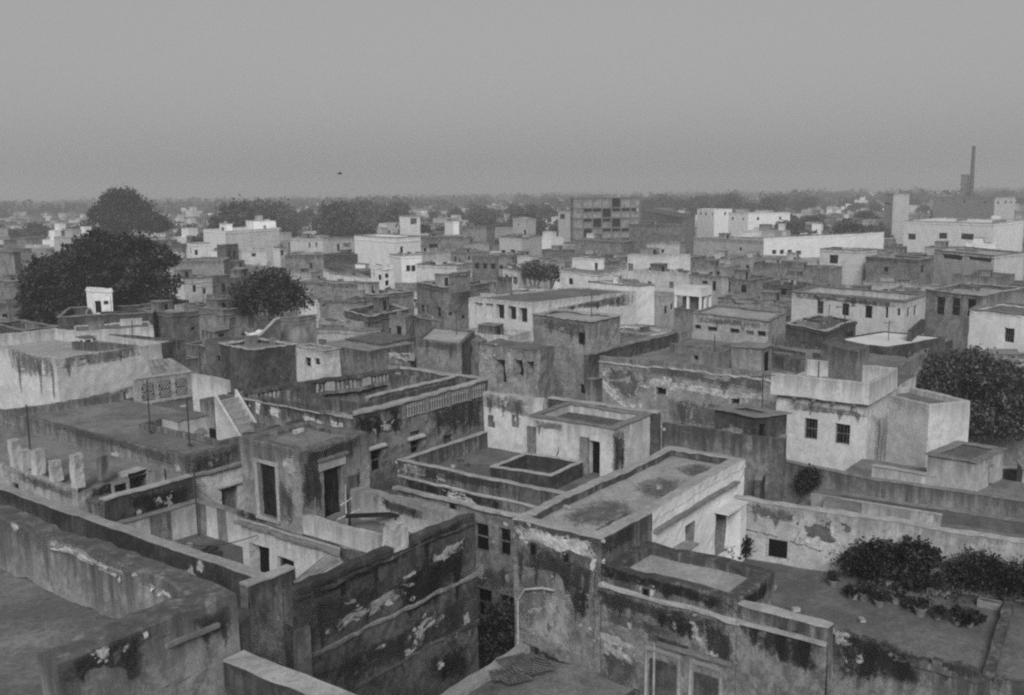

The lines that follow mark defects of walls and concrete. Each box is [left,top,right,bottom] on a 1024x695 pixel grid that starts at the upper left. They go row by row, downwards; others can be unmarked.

leakage [12,350,54,394]
leakage [642,478,677,496]
peeling [50,541,171,599]
peeling [325,570,416,635]
peeling [433,538,465,562]
leakage [302,500,733,682]
peeling [503,522,605,571]
peeling [785,514,851,550]
leakage [67,633,144,681]
peeling [404,613,445,656]